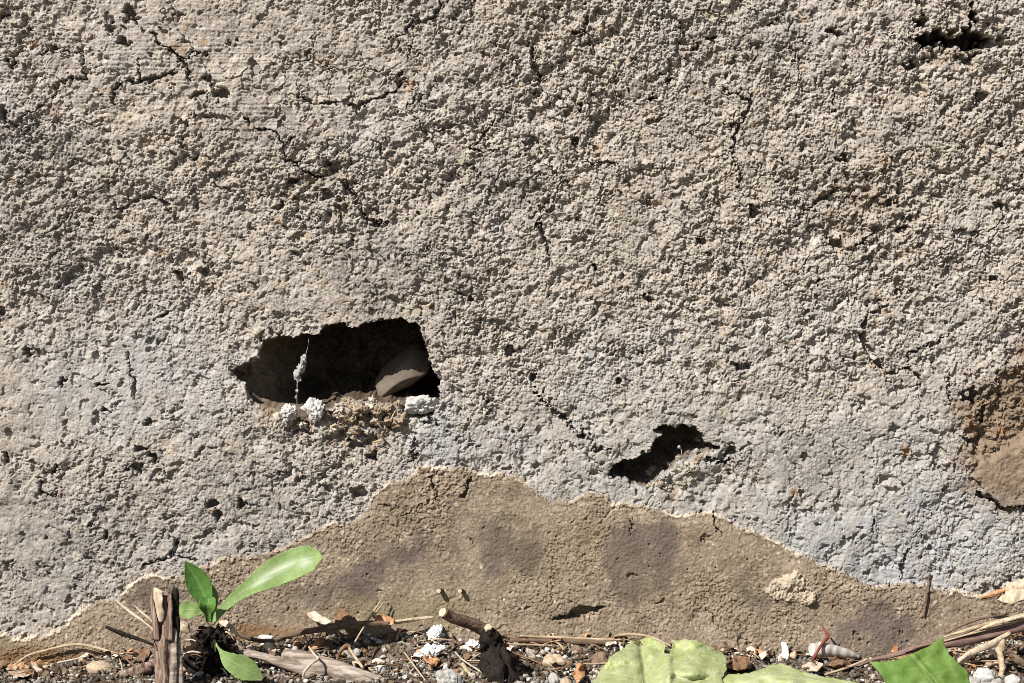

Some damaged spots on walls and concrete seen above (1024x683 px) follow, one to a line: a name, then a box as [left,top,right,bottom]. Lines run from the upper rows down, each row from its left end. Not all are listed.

crack [22,30,209,116]
spalling [900,1,994,73]
crack [256,127,390,227]
spalling [230,308,441,450]
spalling [38,480,58,498]
hole [125,461,144,476]
spalling [200,424,1005,599]
spalling [959,350,1024,512]
spalling [0,573,185,642]
hole [552,604,605,622]